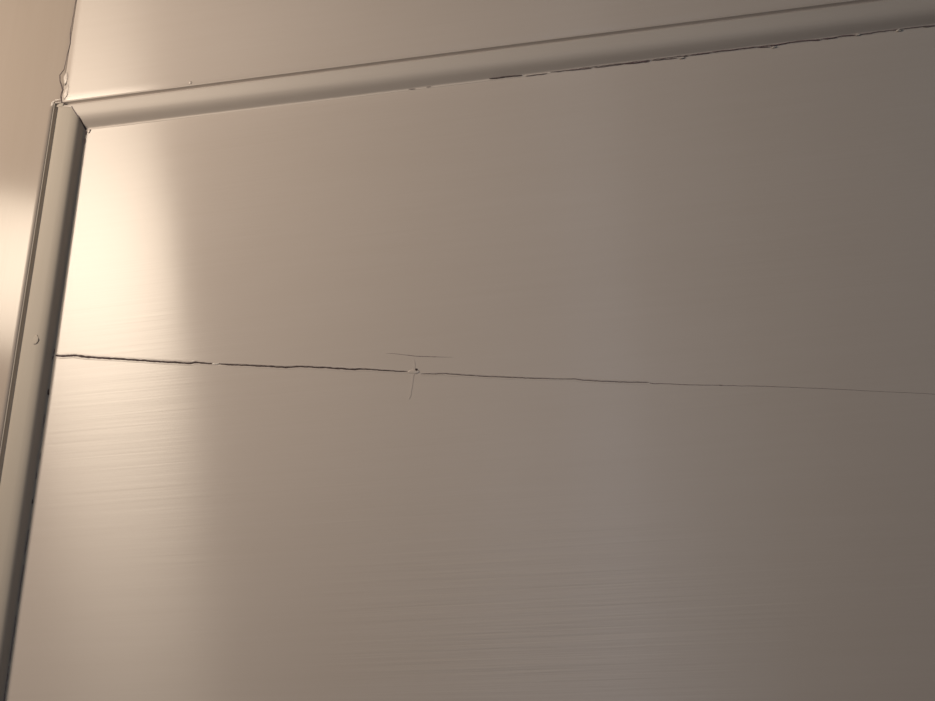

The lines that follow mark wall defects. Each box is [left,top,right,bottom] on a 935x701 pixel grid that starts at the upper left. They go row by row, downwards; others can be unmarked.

crack [57,0,91,144]
crack [52,349,689,385]
crack [4,530,29,701]